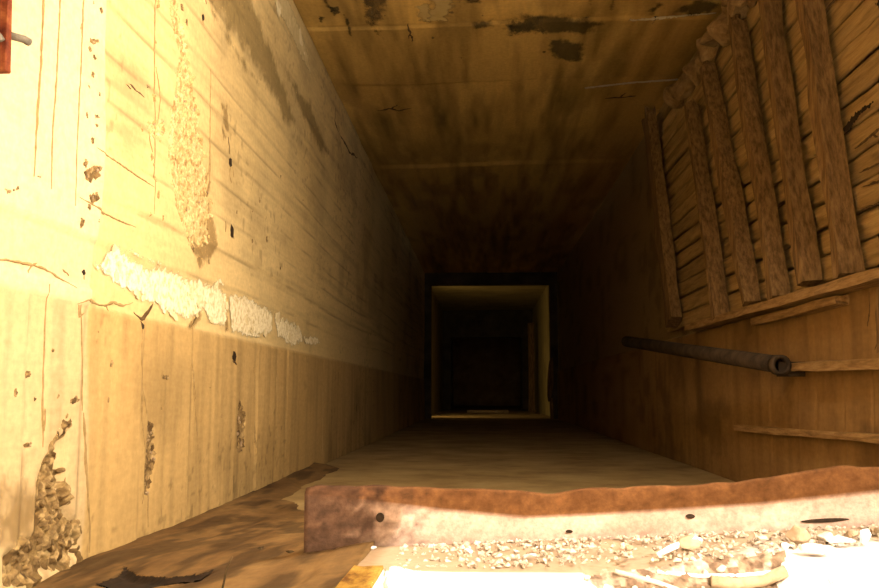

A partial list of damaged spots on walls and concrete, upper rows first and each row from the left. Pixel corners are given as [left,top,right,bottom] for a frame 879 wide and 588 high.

damp [319,0,351,36]
damp [364,0,386,32]
damp [508,15,600,61]
damp [629,0,719,21]
damp [193,204,217,267]
crack [0,258,153,553]
spalling [144,421,156,495]